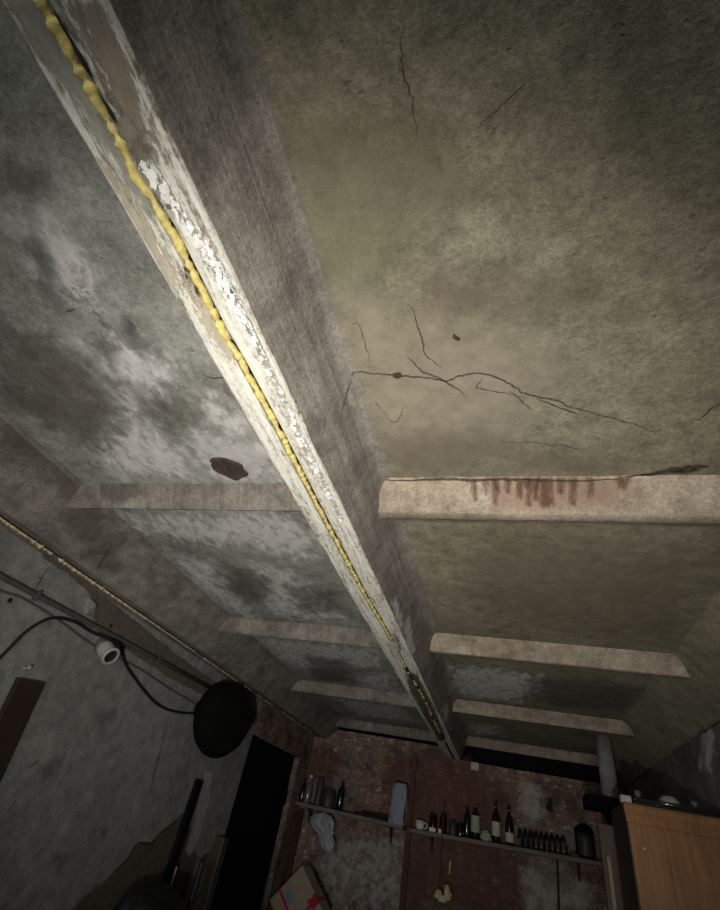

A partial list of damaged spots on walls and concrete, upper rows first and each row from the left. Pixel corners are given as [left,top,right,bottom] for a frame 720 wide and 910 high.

crack [399,19,417,133]
crack [480,80,530,136]
peeling [9,0,344,522]
damp [8,207,283,490]
crack [341,307,660,432]
corrosion [494,479,576,506]
crack [387,465,709,482]